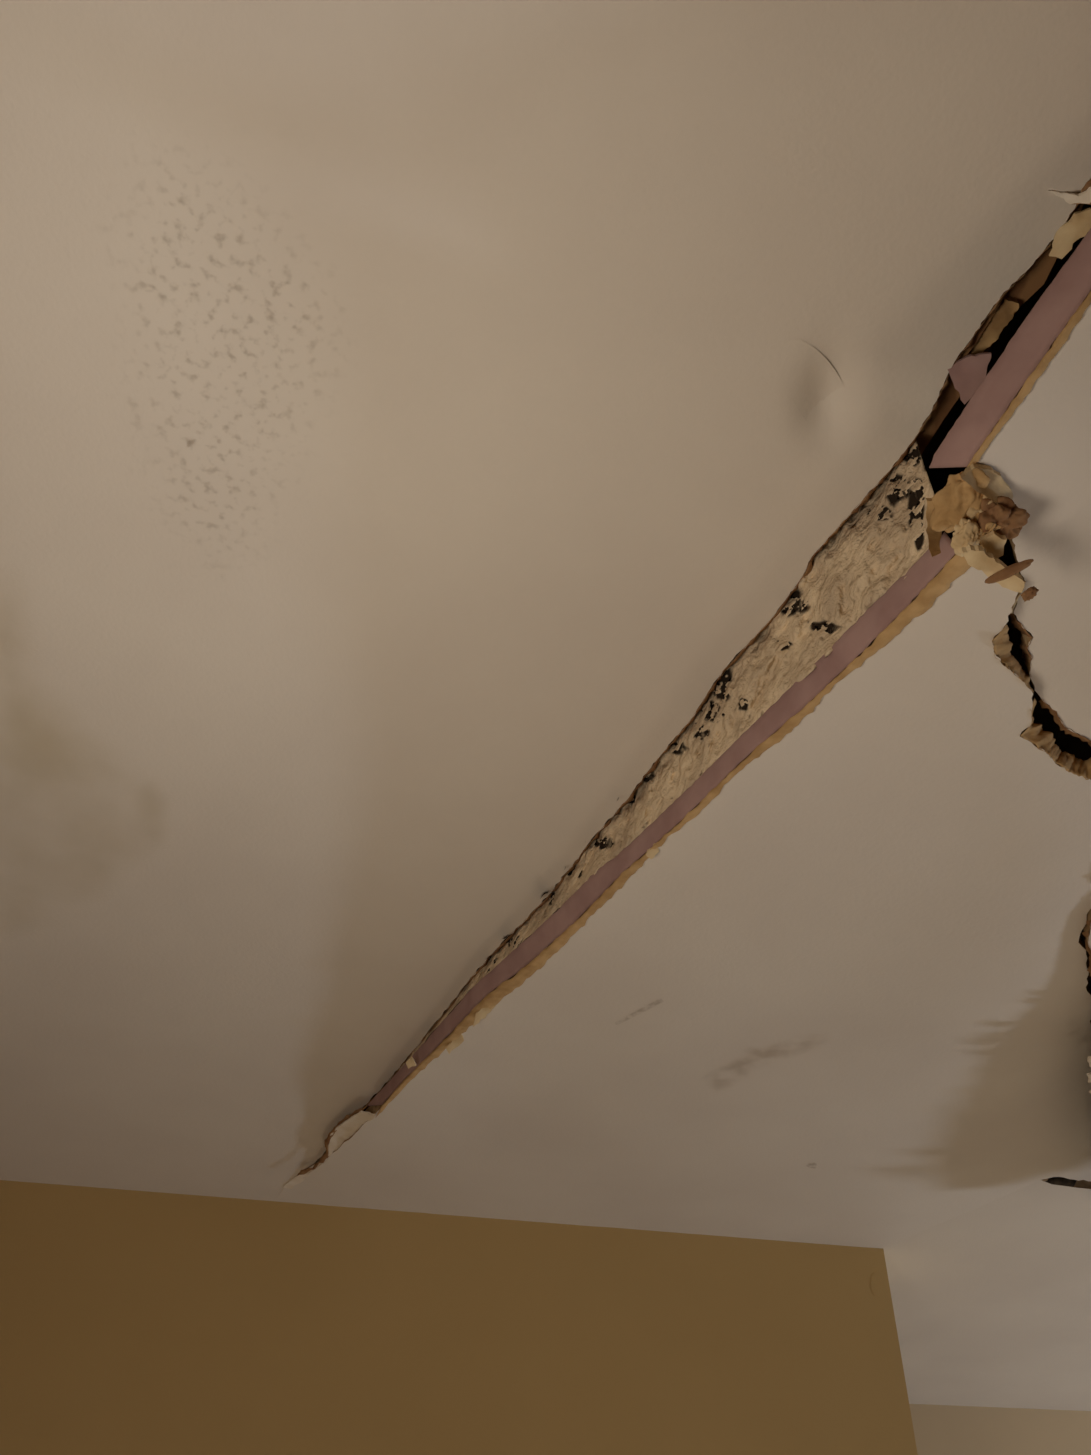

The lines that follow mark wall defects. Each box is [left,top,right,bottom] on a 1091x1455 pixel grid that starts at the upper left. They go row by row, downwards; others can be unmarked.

crack [992,581,1091,780]
crack [1082,920,1091,976]
crack [1083,1056,1091,1093]